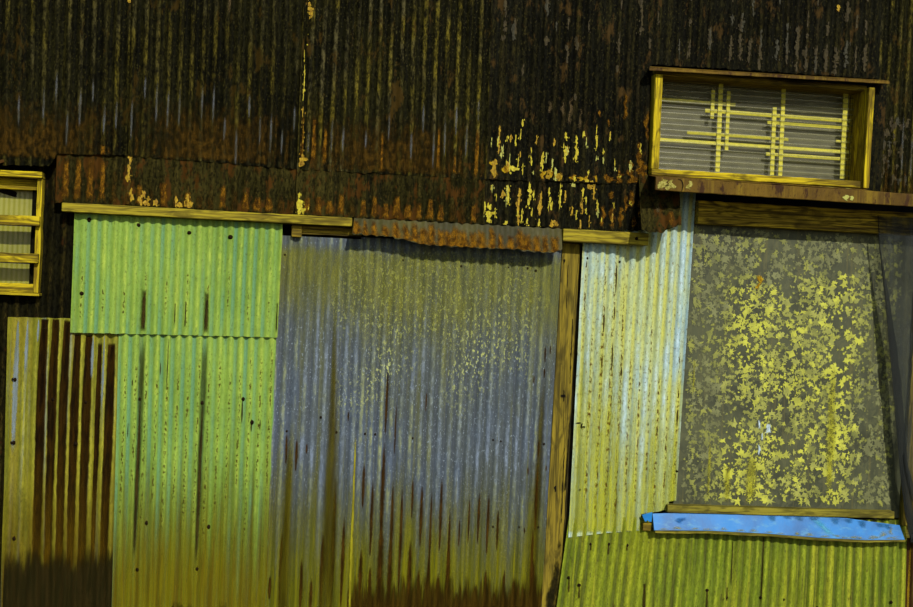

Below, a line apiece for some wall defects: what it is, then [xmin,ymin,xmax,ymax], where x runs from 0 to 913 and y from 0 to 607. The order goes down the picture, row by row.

corrosion [0,109,558,252]
peeling [484,119,632,229]
corrosion [540,115,649,227]
corrosion [32,319,273,567]
corrosion [285,436,308,470]
corrosion [299,374,547,607]
corrosion [268,537,283,599]